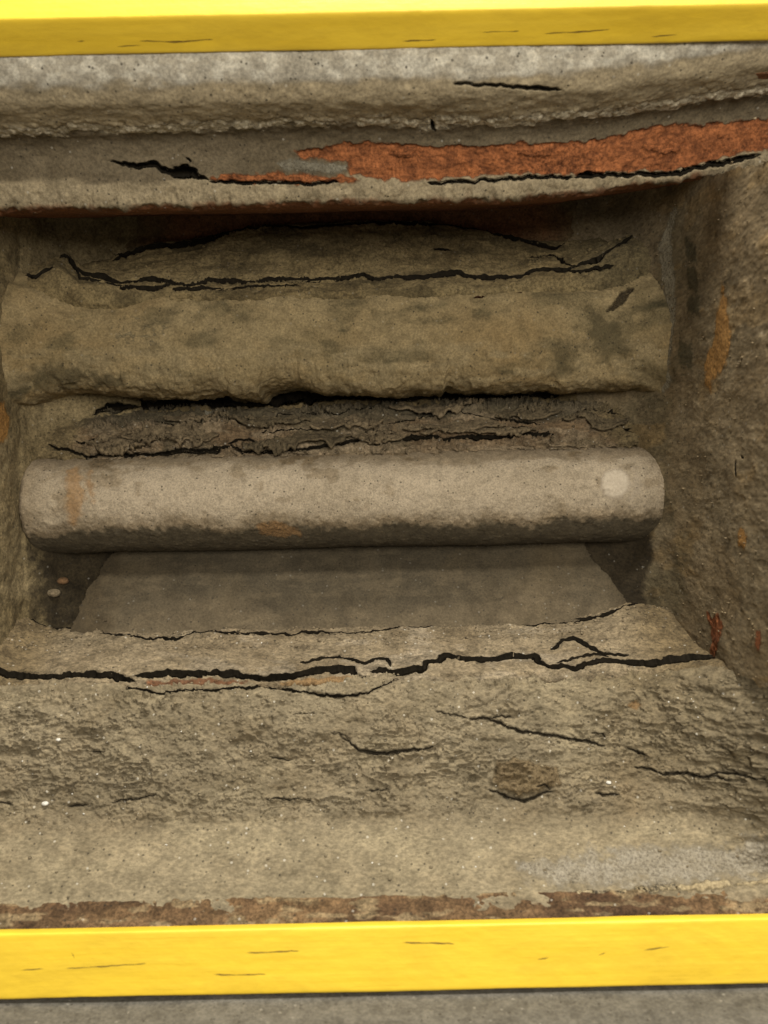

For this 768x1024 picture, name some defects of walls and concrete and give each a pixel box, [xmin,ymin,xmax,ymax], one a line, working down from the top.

crack [112,158,337,186]
crack [428,154,761,185]
crack [25,221,633,298]
rust [704,284,731,391]
spalling [93,402,141,415]
crack [0,603,715,715]
rust [706,611,723,656]
crack [437,711,766,781]